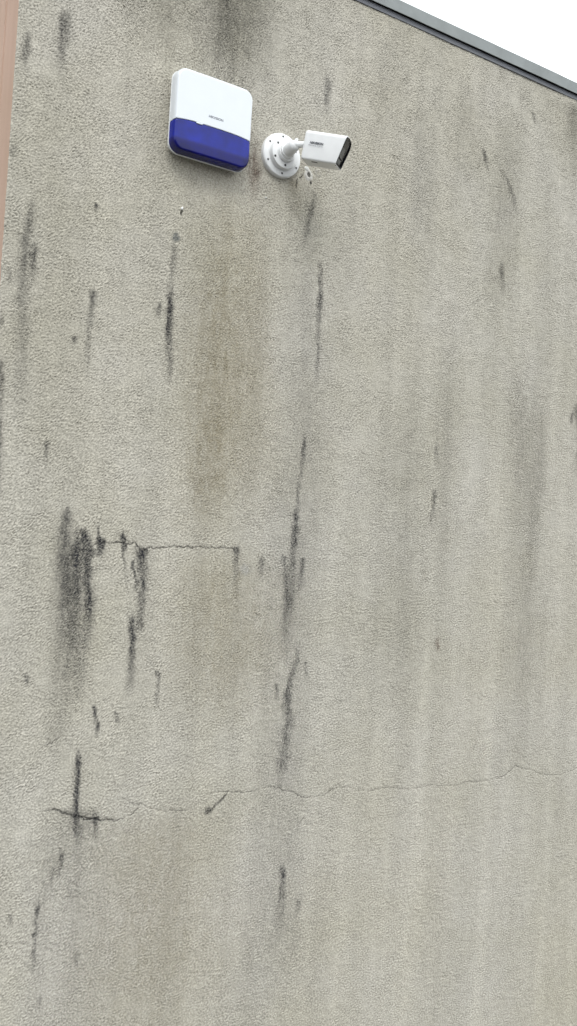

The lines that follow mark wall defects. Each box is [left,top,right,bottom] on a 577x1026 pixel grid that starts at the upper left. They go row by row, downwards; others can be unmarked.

damp [60,513,105,617]
damp [73,757,81,828]